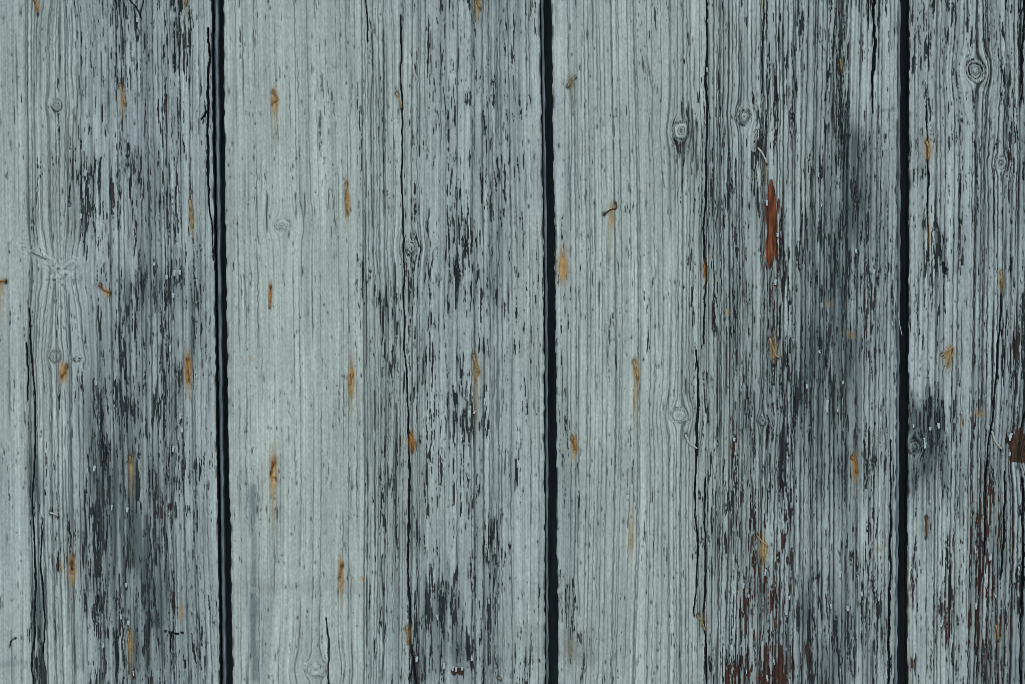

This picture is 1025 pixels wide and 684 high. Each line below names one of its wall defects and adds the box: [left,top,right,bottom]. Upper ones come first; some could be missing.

peeling [763,180,780,290]
peeling [800,105,897,294]
peeling [67,254,195,680]
peeling [453,379,487,461]
peeling [768,311,870,497]
peeling [908,388,947,472]
peeling [1001,429,1025,467]
peeling [412,557,496,675]
peeling [725,523,882,684]
peeling [940,476,1015,662]